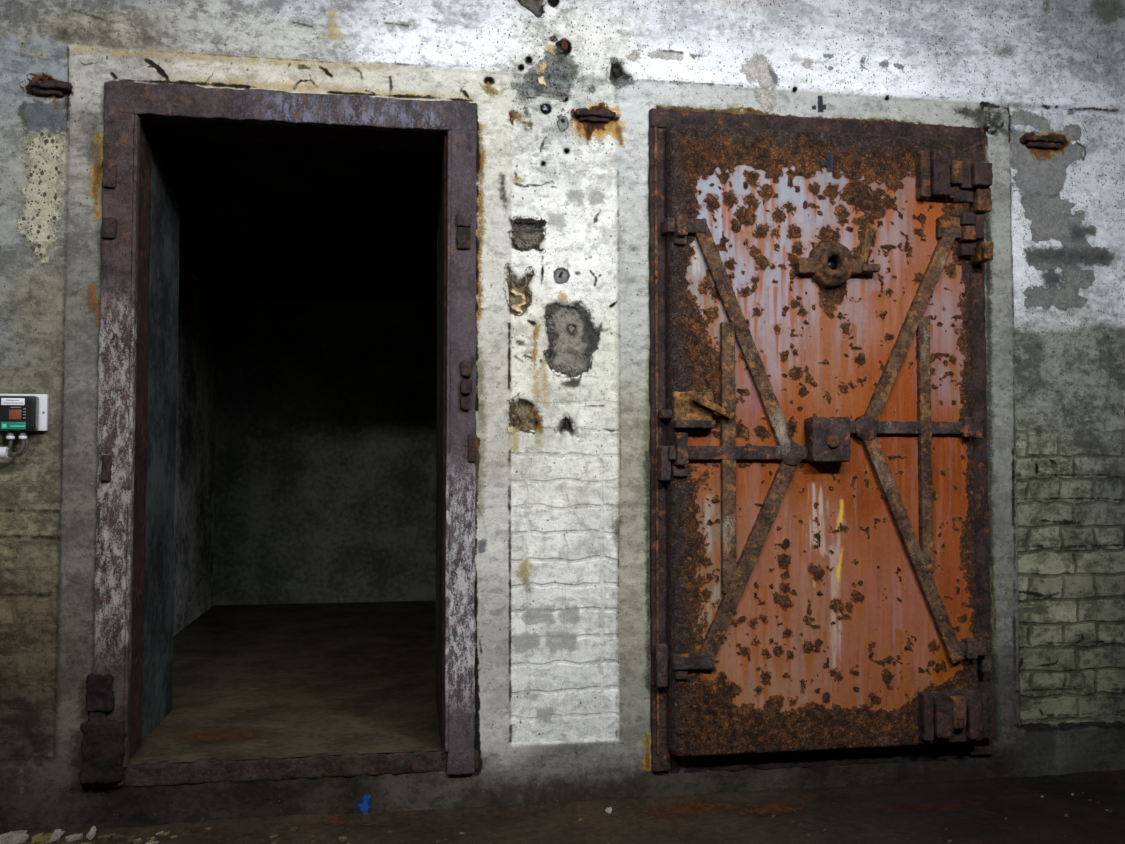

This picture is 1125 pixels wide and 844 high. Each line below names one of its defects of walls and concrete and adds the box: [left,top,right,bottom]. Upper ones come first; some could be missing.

spalling [520,0,545,18]
rust [20,72,75,102]
spalling [509,34,596,130]
rust [570,101,626,148]
rust [656,103,798,117]
rust [812,116,984,133]
rust [1020,129,1071,160]
spalling [16,127,67,264]
peeling [1010,109,1115,312]
spalling [503,189,604,316]
spalling [507,393,543,450]